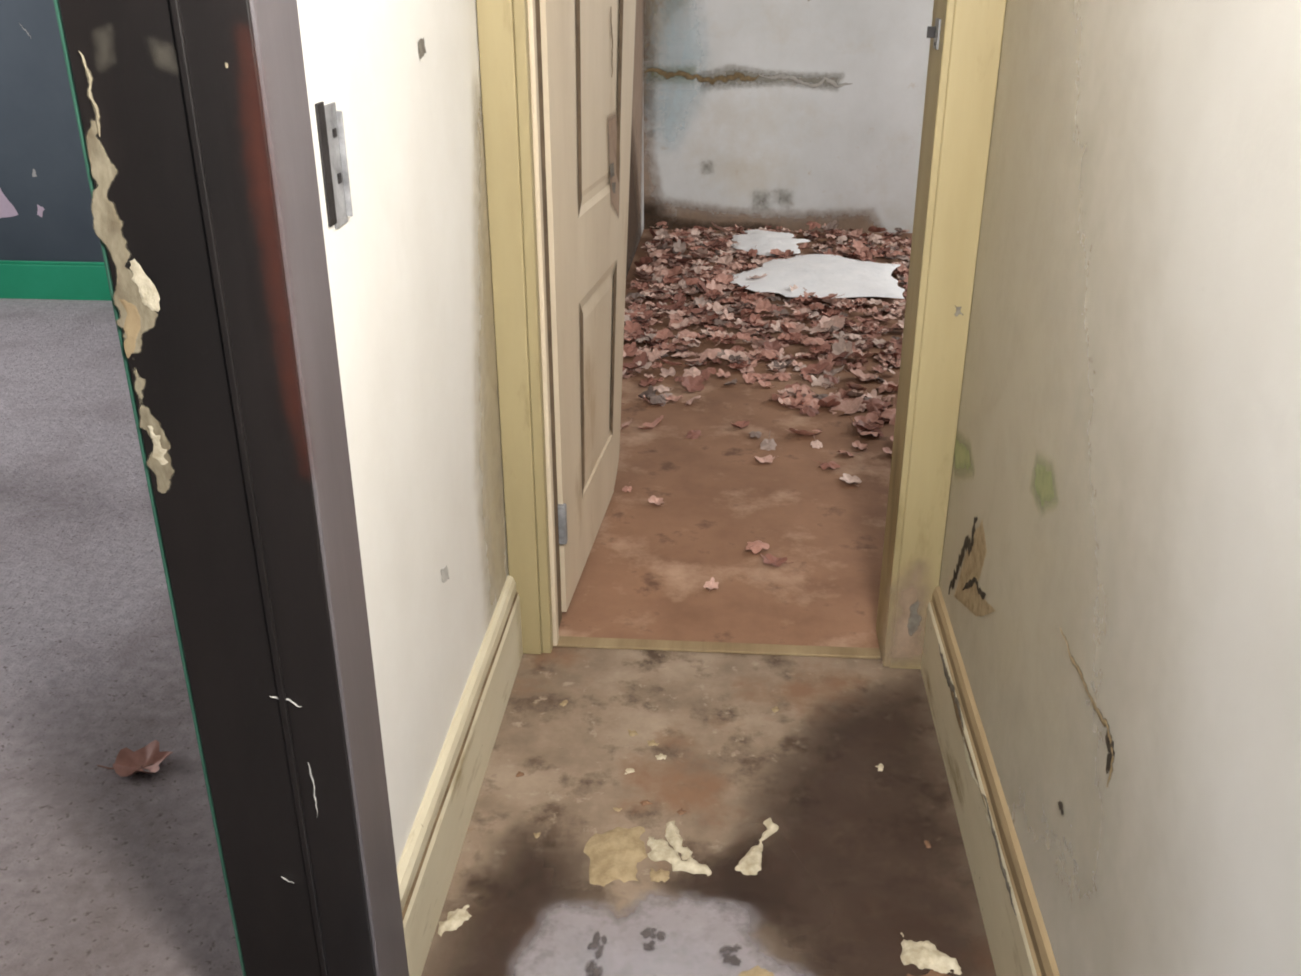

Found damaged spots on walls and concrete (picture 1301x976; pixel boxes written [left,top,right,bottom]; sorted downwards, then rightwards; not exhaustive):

peeling [79,51,175,493]
leakage [449,843,583,976]
leakage [673,689,990,976]